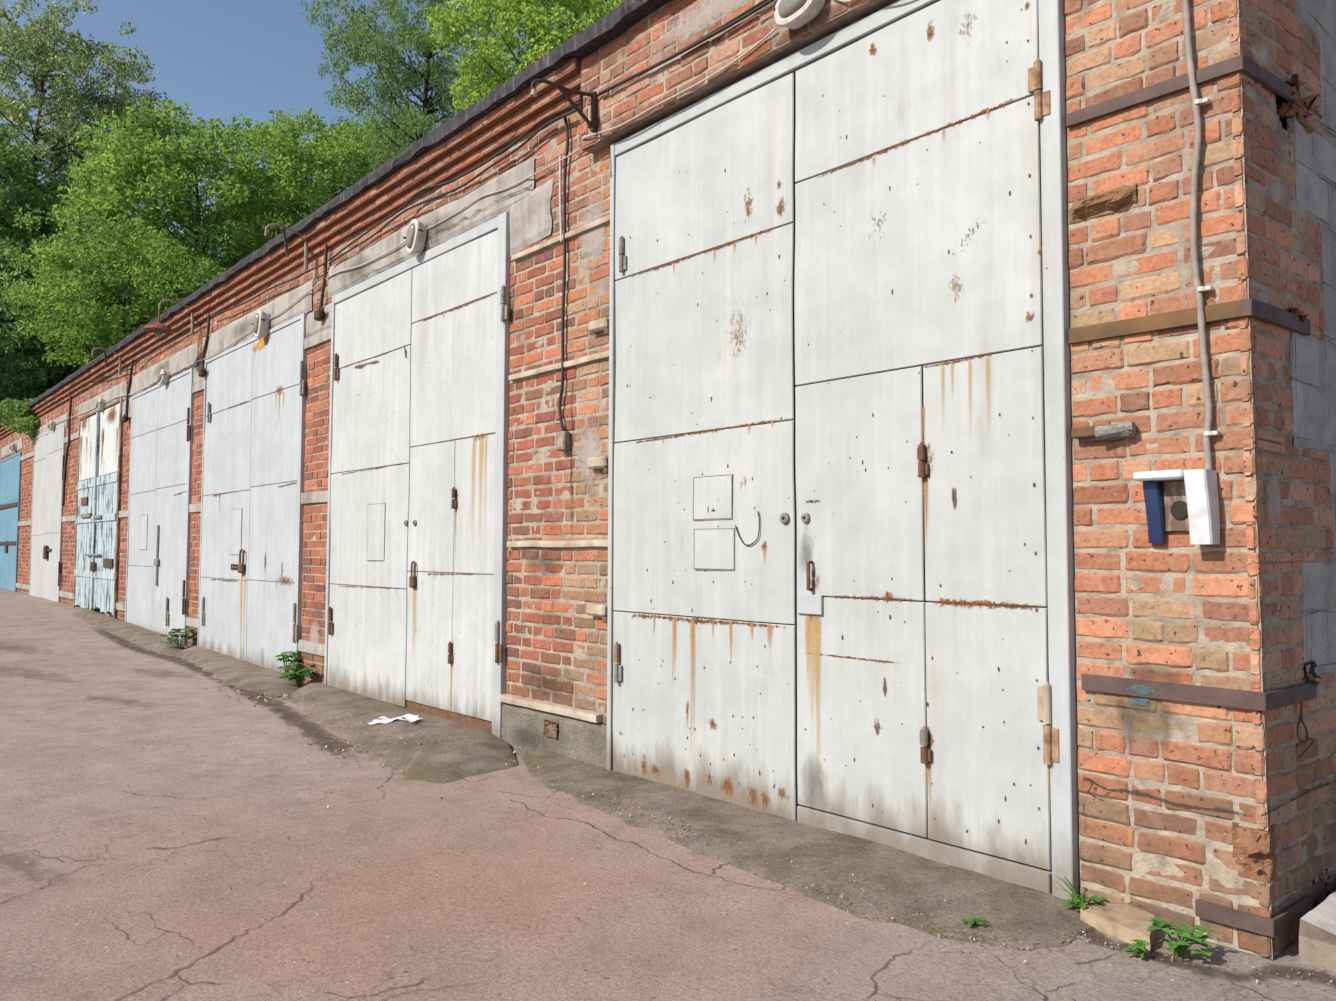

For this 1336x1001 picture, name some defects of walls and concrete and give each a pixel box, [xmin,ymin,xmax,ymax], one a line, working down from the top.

rust [924,354,991,392]
rust [919,406,933,521]
rust [631,600,785,679]
rust [834,577,915,623]
rust [685,703,785,808]
crack [31,801,177,889]
crack [97,912,219,984]
crack [324,977,425,1001]